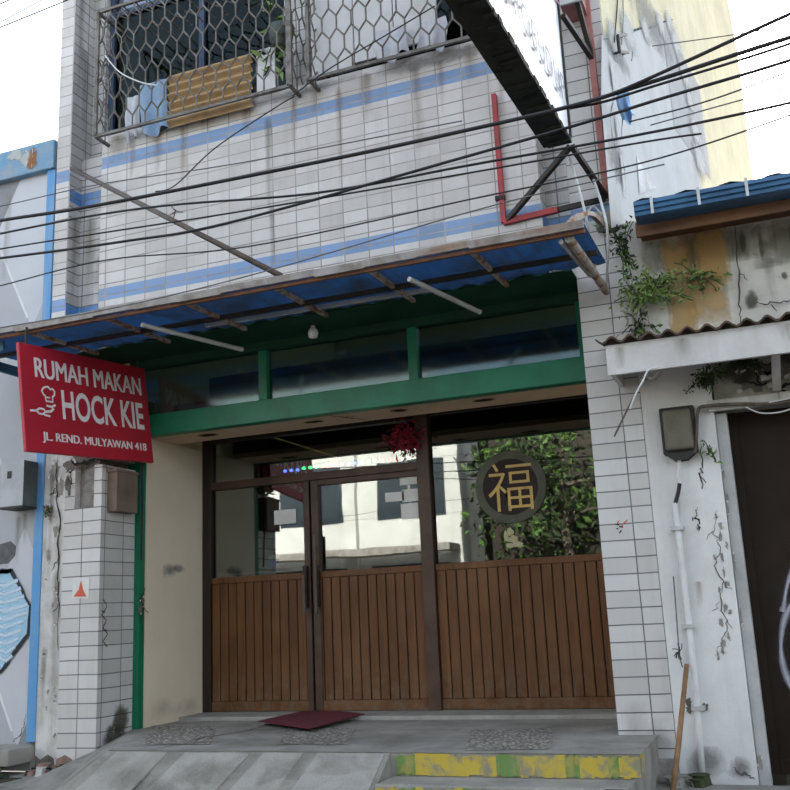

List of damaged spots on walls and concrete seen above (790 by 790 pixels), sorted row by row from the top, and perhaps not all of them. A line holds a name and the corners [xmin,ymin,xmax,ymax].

peeling [7,145,37,169]
crack [734,225,790,322]
crack [744,373,790,392]
crack [50,457,104,644]